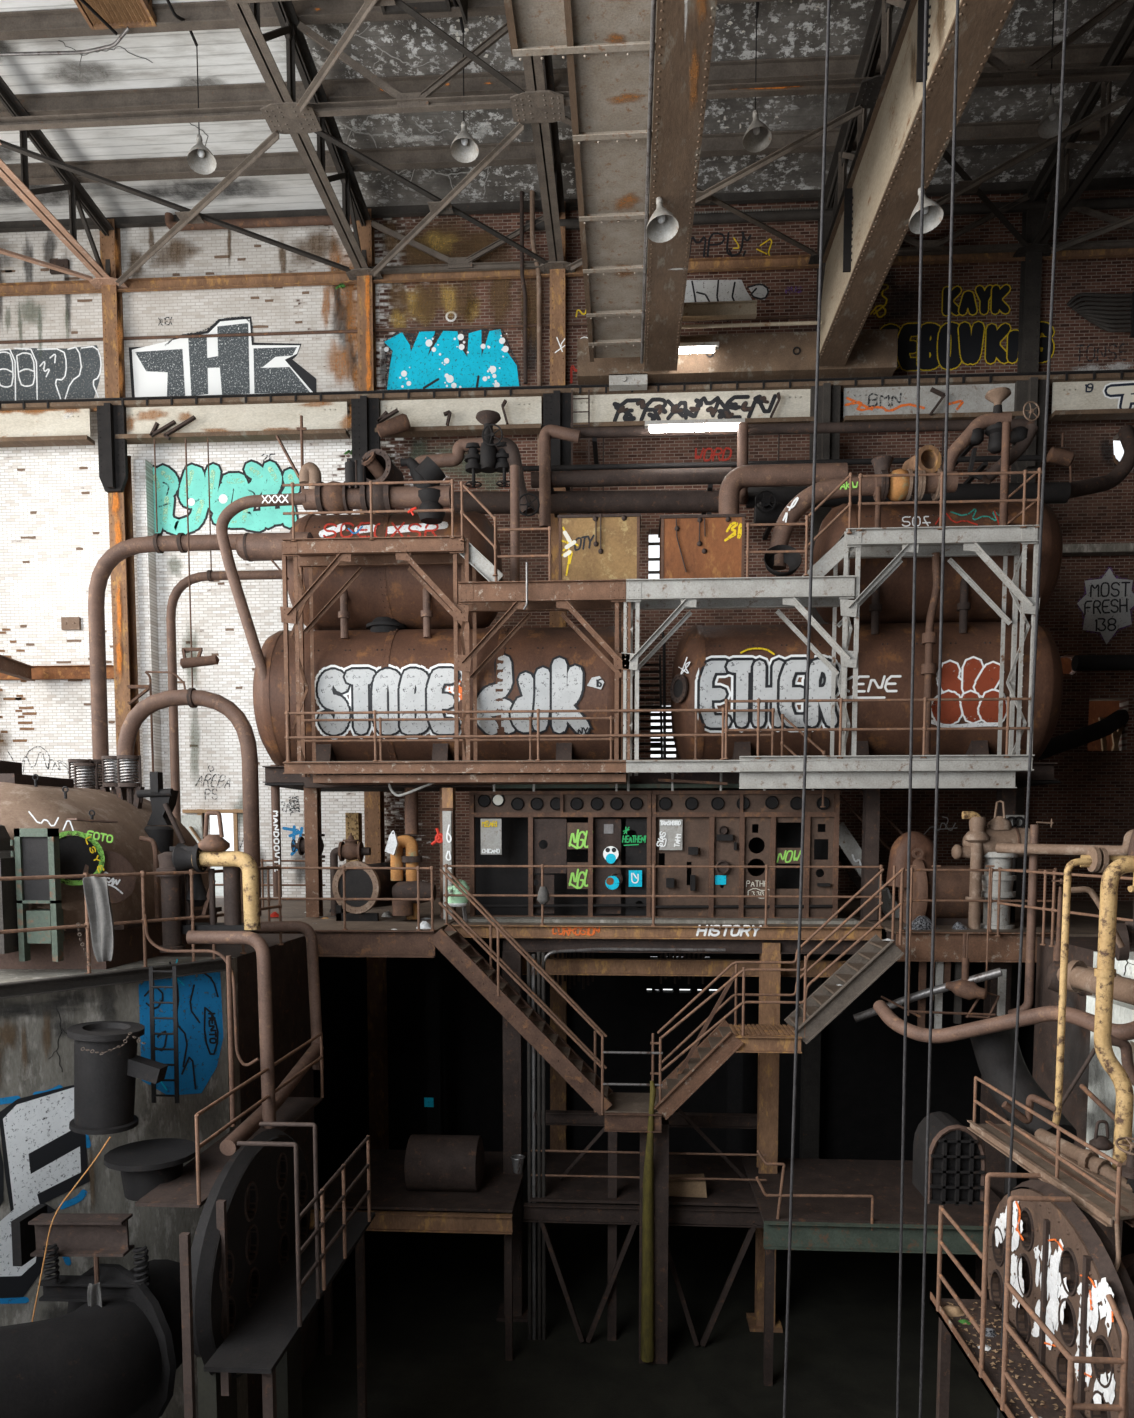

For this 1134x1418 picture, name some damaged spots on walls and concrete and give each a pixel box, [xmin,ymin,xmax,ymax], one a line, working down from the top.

corrosion [112,492,121,544]